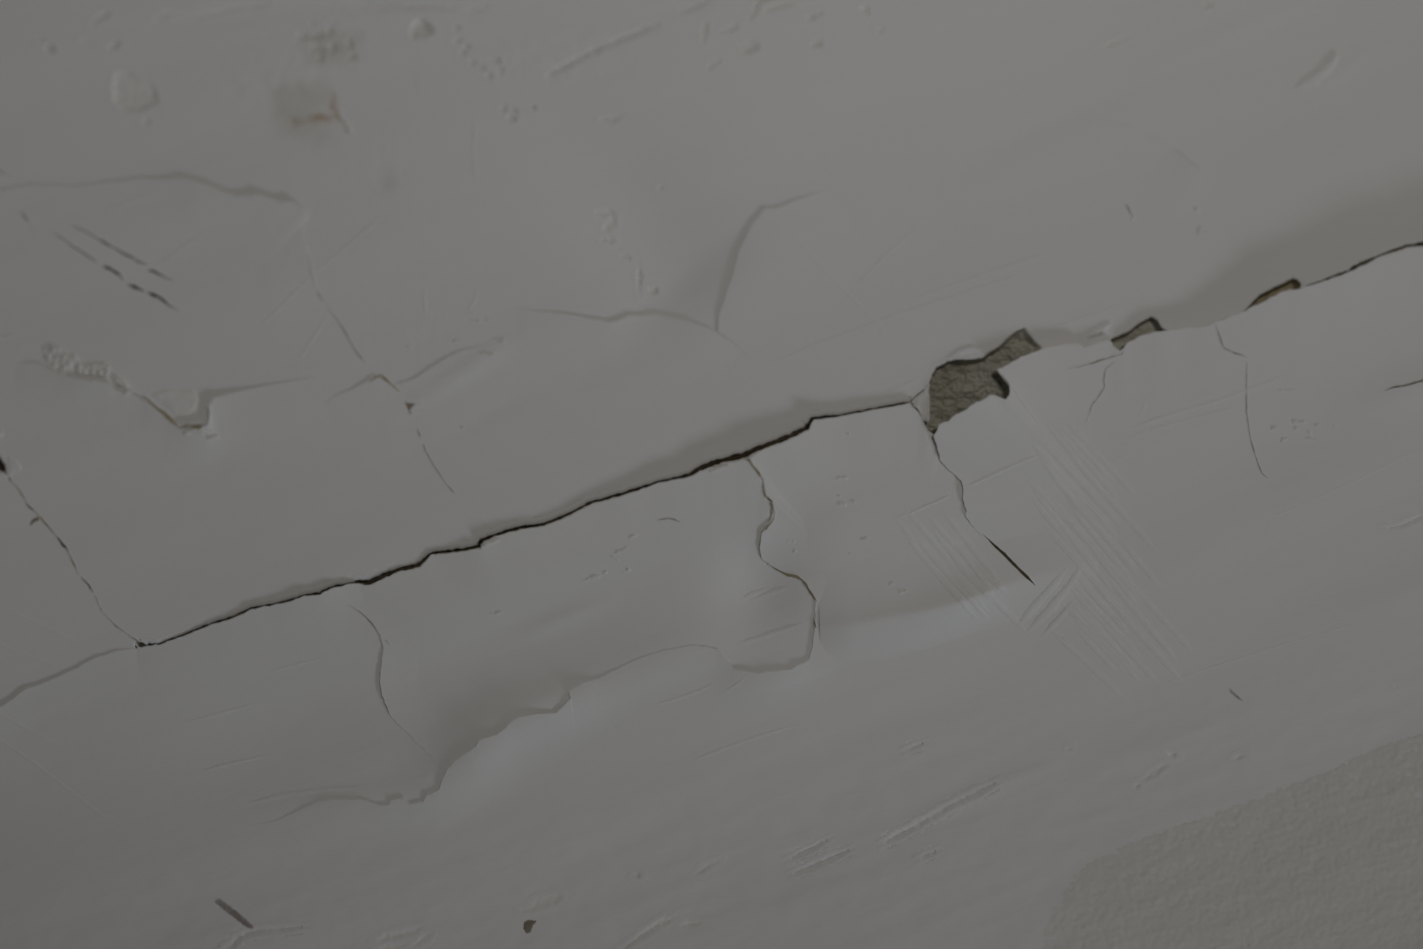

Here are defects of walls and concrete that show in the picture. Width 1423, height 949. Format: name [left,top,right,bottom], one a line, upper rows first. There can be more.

crack [54,225,179,312]
crack [1302,241,1423,288]
peeling [16,362,326,467]
crack [305,244,455,494]
crack [1067,350,1125,423]
crack [1214,324,1269,479]
crack [1384,378,1423,392]
spalling [0,447,12,480]
crack [3,383,930,649]
peeling [138,246,1423,854]
crack [982,534,1036,586]